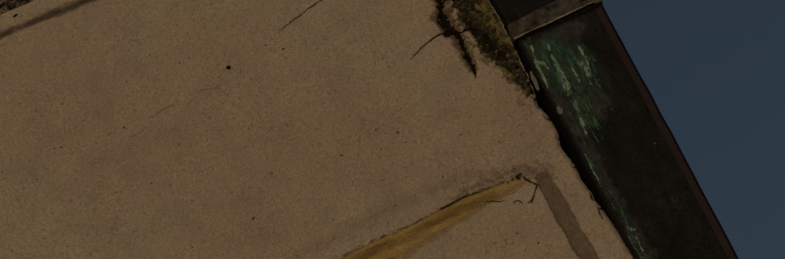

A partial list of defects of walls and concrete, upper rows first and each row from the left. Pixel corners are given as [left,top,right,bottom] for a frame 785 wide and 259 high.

crack [411,0,477,78]
leakage [524,19,658,259]
crack [487,175,538,204]